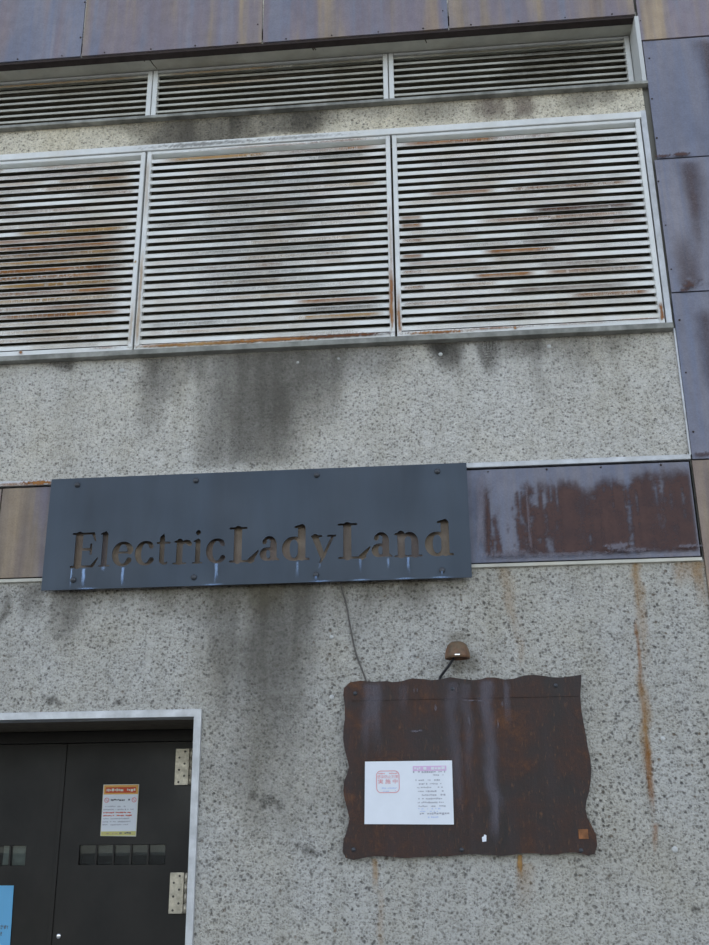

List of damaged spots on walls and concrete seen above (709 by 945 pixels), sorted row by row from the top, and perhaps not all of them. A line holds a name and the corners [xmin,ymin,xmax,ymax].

corrosion [518,181,621,189]
corrosion [500,203,630,225]
corrosion [0,226,121,318]
corrosion [575,284,645,297]
corrosion [412,326,516,334]
corrosion [484,492,502,557]
corrosion [512,472,698,555]